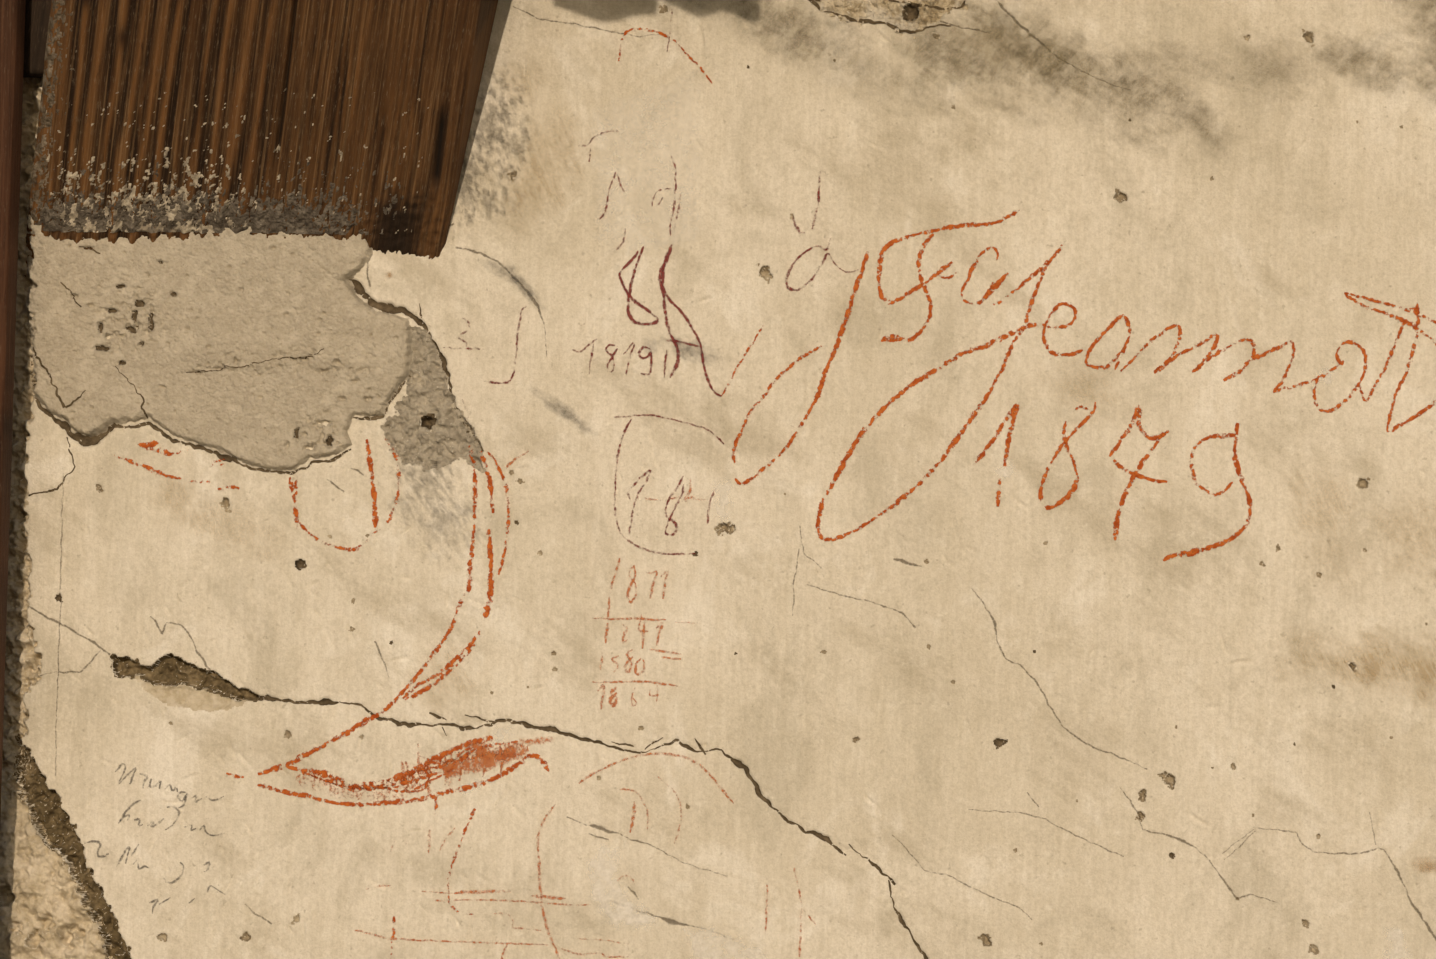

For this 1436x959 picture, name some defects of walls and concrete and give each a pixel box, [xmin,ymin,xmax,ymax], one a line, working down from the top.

spalling [809,0,969,39]
spalling [96,300,154,365]
spalling [381,325,486,473]
crack [13,539,928,959]
crack [982,601,1274,902]
crack [1272,829,1436,939]